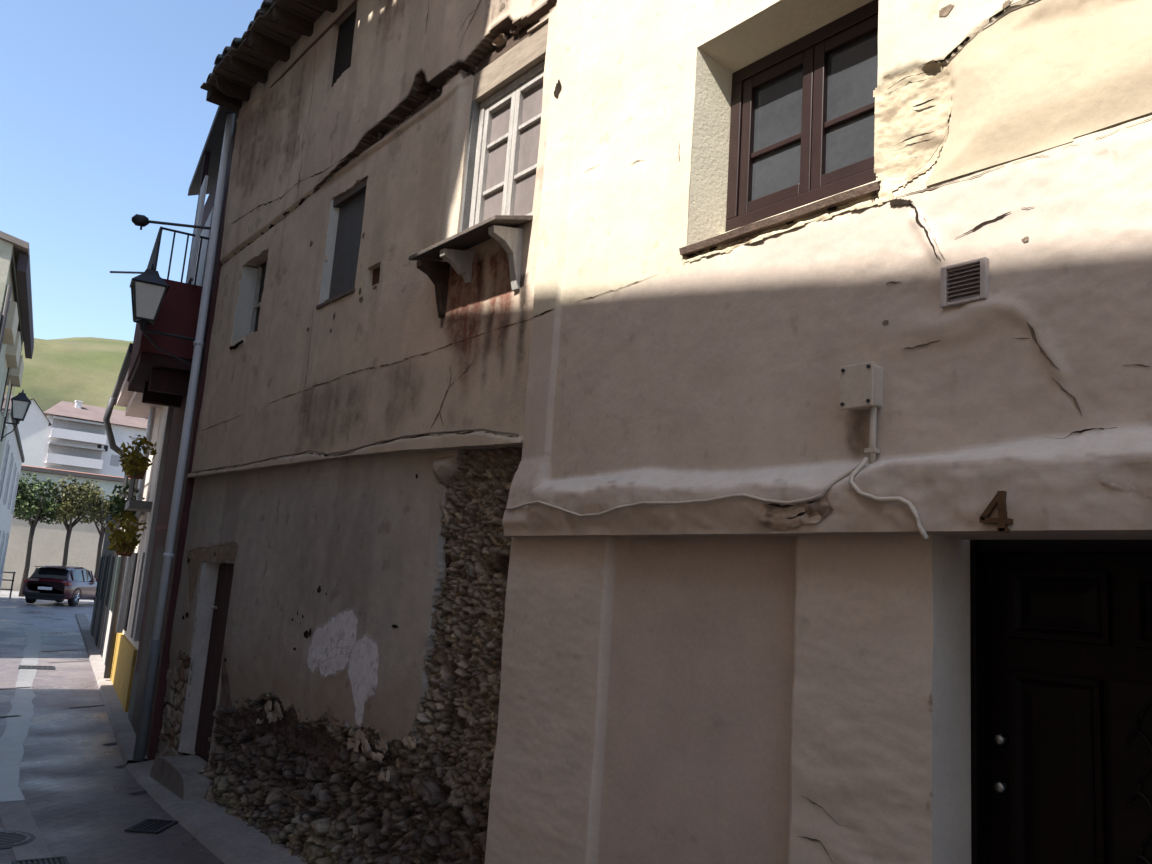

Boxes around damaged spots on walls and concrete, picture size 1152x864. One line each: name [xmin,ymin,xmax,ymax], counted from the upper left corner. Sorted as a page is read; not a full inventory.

crack [917,0,1038,68]
spalling [683,59,953,264]
crack [890,118,1151,259]
corrosion [447,252,511,352]
crack [195,274,657,473]
crack [1014,322,1117,439]
spalling [757,497,833,530]
spalling [198,446,522,864]